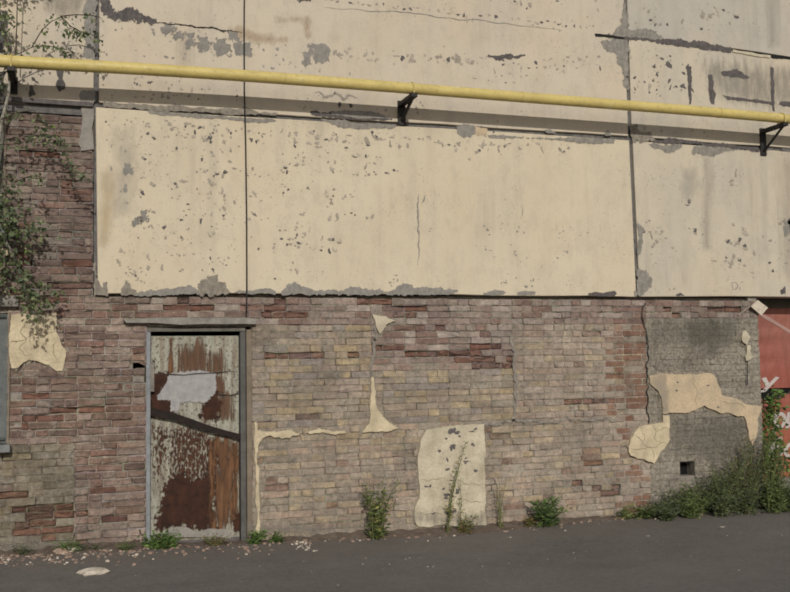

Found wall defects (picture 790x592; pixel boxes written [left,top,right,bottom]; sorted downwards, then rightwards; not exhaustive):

peeling [330,0,498,23]
peeling [263,43,379,72]
peeling [392,3,732,104]
spalling [47,76,615,319]
peeling [711,223,755,281]
peeling [778,217,790,252]
rust [150,337,240,532]
peeling [438,427,477,471]